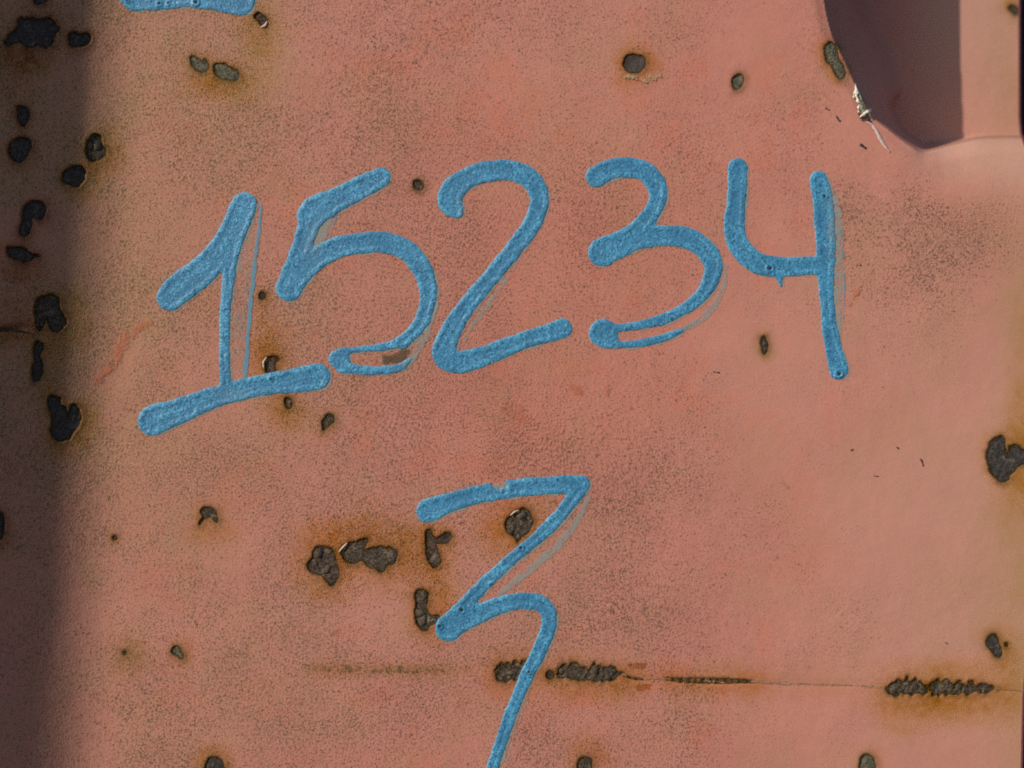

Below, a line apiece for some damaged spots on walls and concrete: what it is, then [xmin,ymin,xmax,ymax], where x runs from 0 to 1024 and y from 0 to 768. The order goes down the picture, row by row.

spalling [4,17,91,49]
spalling [8,106,32,163]
spalling [62,134,107,187]
spalling [7,201,46,263]
spalling [31,294,67,382]
spalling [47,395,82,442]
spalling [986,435,1024,483]
crack [622,673,885,688]